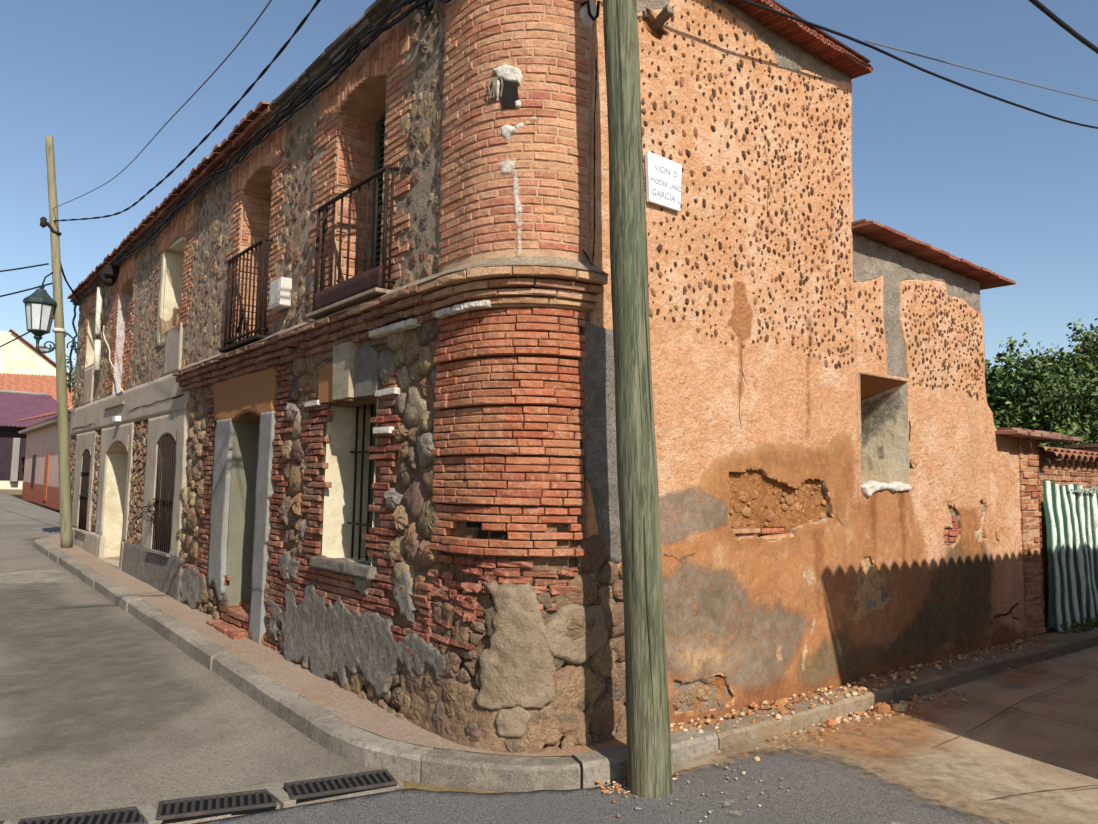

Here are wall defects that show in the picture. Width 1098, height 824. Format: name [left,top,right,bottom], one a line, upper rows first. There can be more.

spalling [487,64,523,109]
damp [501,160,522,254]
spalling [466,521,510,540]
flaking render [727,469,834,540]
flaking render [944,502,959,546]
damp [659,432,1024,724]
flaking render [857,556,888,615]